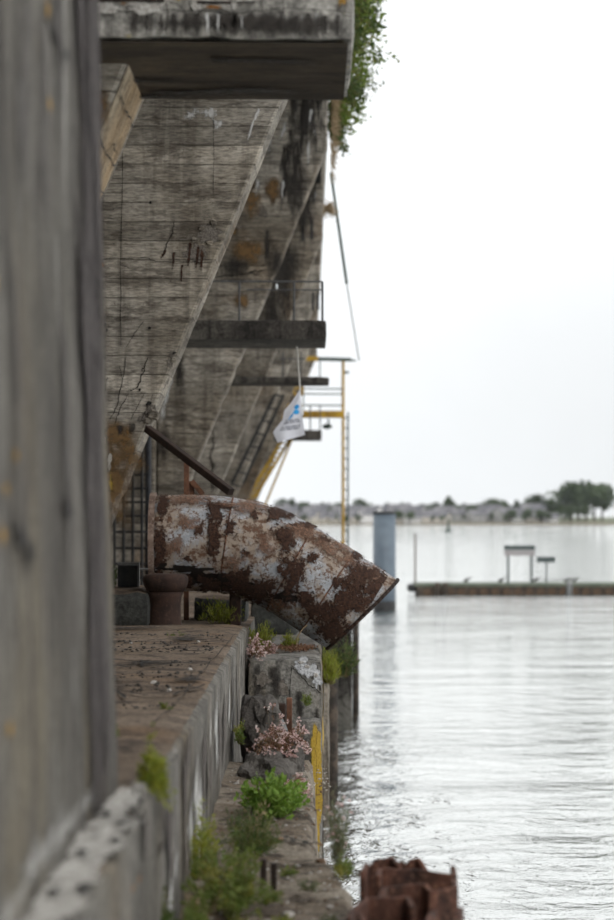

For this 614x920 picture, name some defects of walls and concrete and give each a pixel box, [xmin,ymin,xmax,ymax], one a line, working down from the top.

water stain [130,11,339,35]
water stain [133,79,326,234]
corrosion [244,179,280,217]
crack [100,136,264,423]
water stain [265,230,299,320]
corrosion [107,423,143,524]